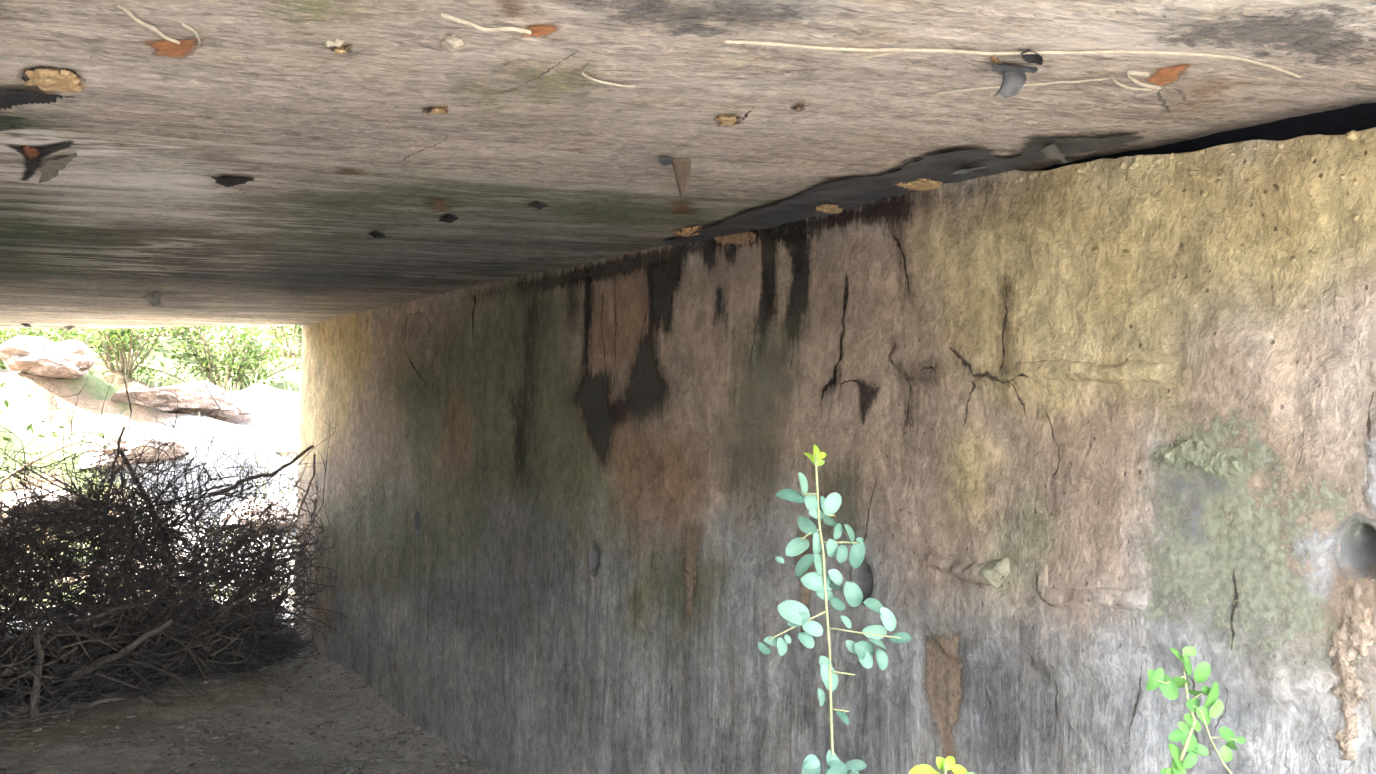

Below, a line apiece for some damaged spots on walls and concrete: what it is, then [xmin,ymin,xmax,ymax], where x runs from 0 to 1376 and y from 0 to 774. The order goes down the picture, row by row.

corrosion [118,5,202,58]
corrosion [440,0,557,53]
spalling [21,65,86,93]
corrosion [1111,65,1190,110]
spalling [0,117,77,183]
spalling [812,204,843,214]
spalling [894,179,943,191]
water stain [749,220,810,385]
water stain [568,254,684,461]
crack [889,277,1060,492]
efflorescence [1368,442,1376,507]
efflorescence [1298,534,1338,598]